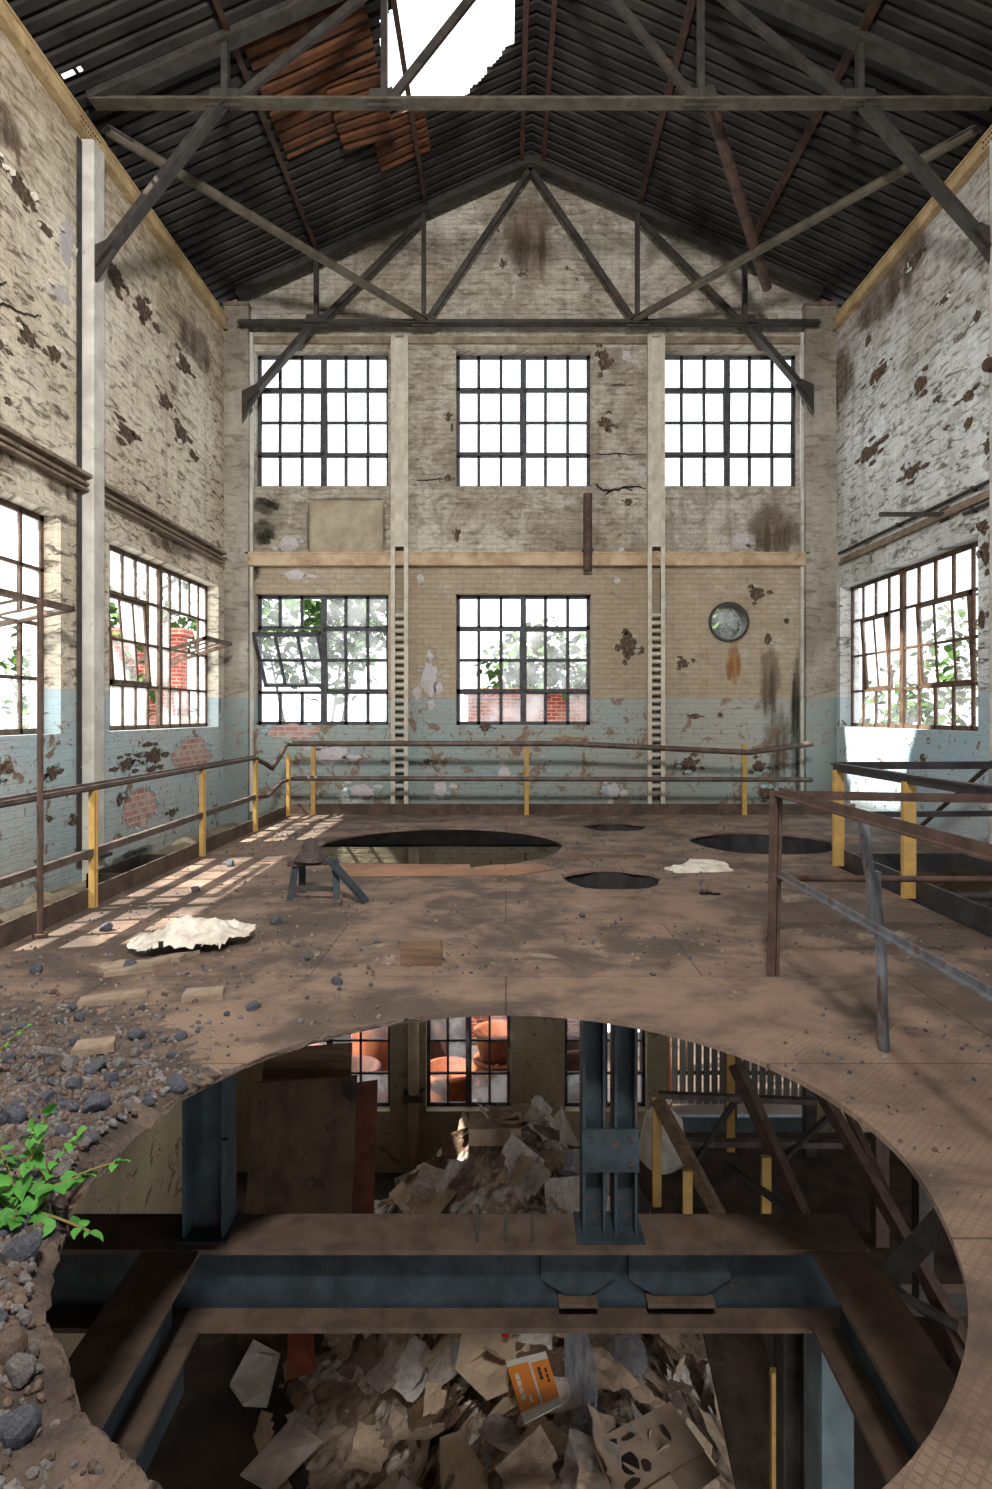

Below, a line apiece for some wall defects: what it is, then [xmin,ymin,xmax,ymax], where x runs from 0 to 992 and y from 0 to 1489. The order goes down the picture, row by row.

peeling [0,151,78,268]
crack [0,281,42,317]
peeling [107,259,161,334]
peeling [0,316,67,369]
peeling [860,357,893,391]
peeling [114,411,142,447]
peeling [155,385,201,464]
peeling [855,434,889,466]
peeling [896,461,931,486]
peeling [909,364,989,471]
peeling [615,628,645,666]
flaking render [109,736,214,832]